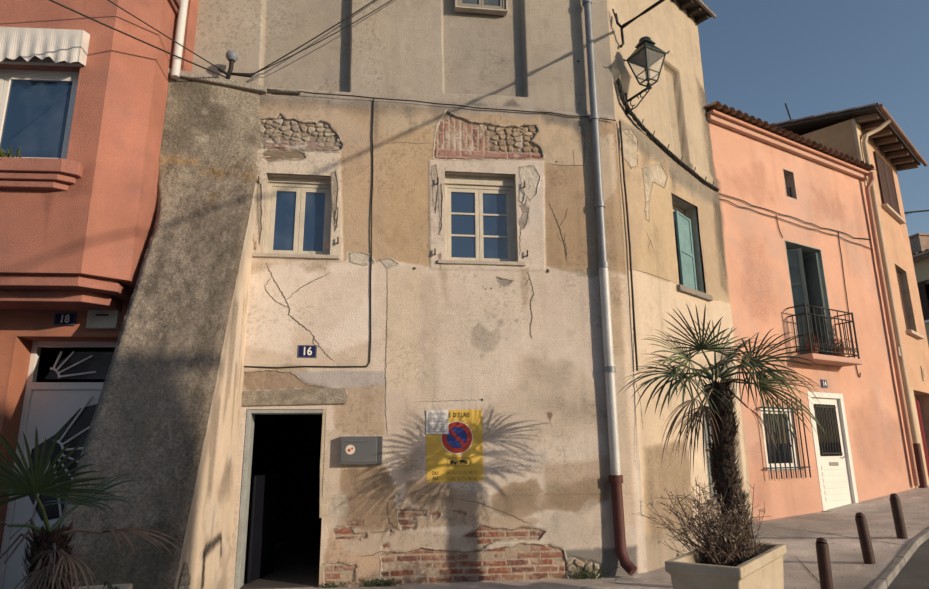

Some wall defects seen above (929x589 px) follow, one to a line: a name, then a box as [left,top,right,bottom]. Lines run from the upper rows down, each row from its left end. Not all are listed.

spalling [255,113,343,168]
flaking render [431,110,557,235]
crack [264,264,332,360]
flaking render [332,521,368,541]
flaking render [379,508,602,586]